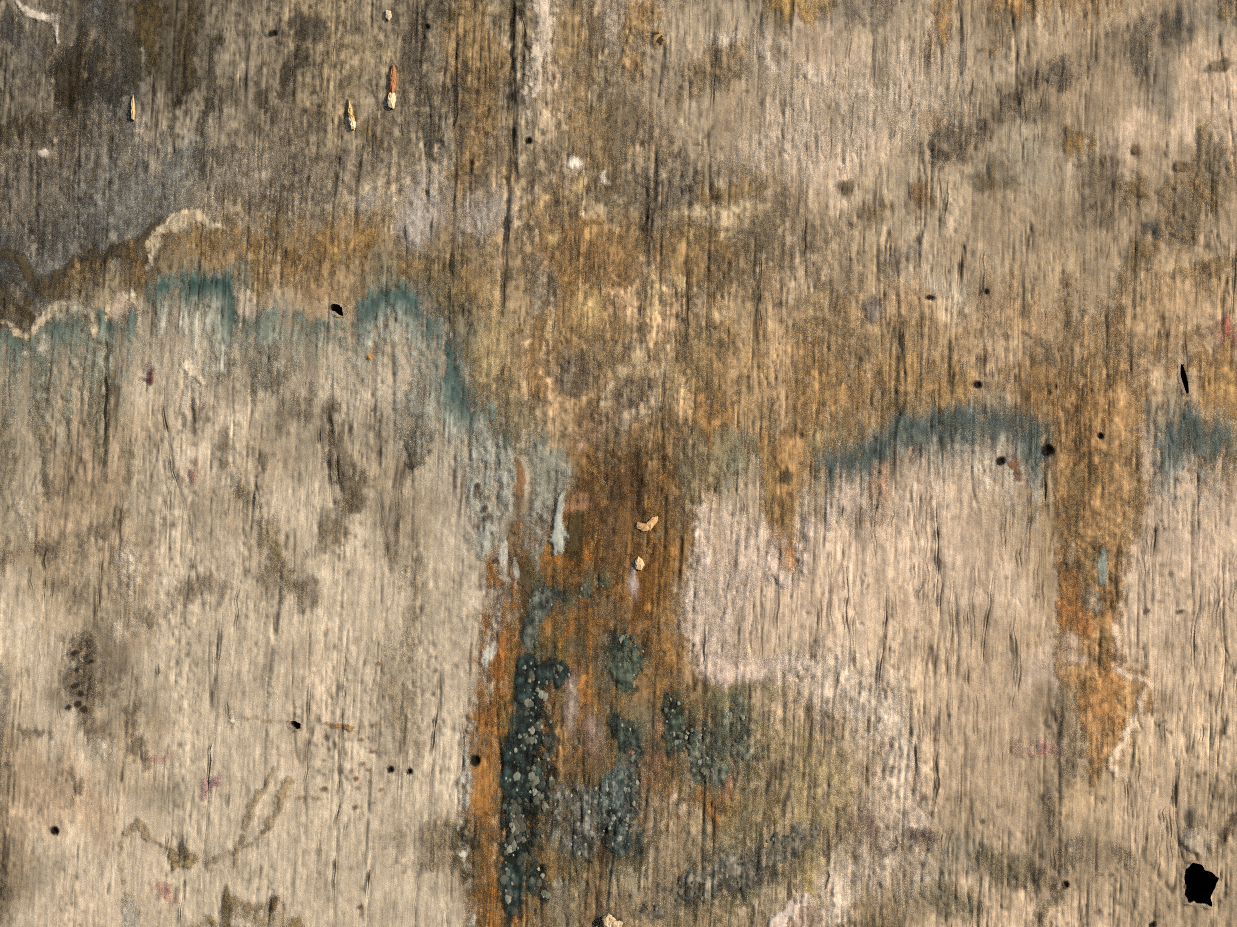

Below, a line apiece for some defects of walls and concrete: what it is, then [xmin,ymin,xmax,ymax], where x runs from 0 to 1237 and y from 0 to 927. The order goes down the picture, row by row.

rust [453,469,735,927]
leakage [498,573,935,927]
rust [1050,371,1153,786]